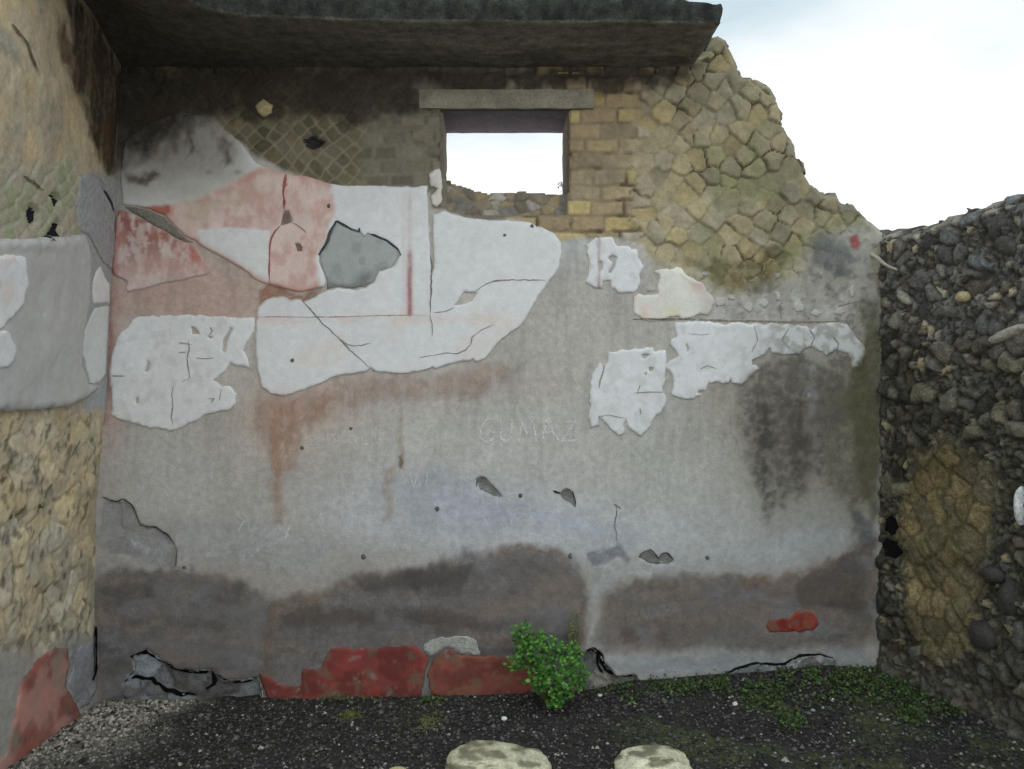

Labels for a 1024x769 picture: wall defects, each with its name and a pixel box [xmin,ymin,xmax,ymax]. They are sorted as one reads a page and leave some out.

crack [268,174,305,280]
flaking render [318,220,401,289]
crack [255,257,494,368]
crack [476,279,539,291]
flaking render [100,497,186,569]
flaking render [475,476,503,497]
flaking render [553,488,576,507]
flaking render [639,550,674,564]
damp [600,356,880,662]
damp [94,544,588,701]
flaking render [123,650,262,699]
flaking render [583,647,638,690]